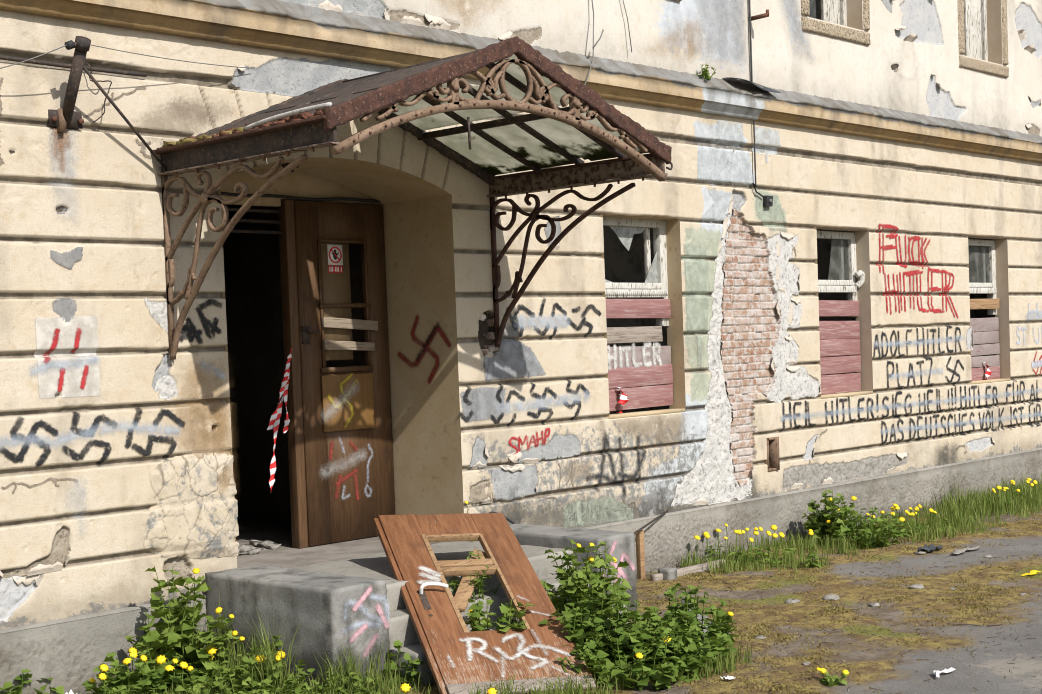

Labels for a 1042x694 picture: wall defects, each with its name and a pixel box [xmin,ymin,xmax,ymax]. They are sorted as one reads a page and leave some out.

flaking render [280,0,460,30]
peeling [882,0,944,45]
peeling [1015,2,1042,58]
flaking render [228,57,399,96]
peeling [926,71,966,121]
flaking render [145,298,168,333]
flaking render [152,353,178,400]
flaking render [638,191,821,517]
flaking render [469,434,581,505]
flaking render [783,434,909,490]
flaking render [0,526,71,622]